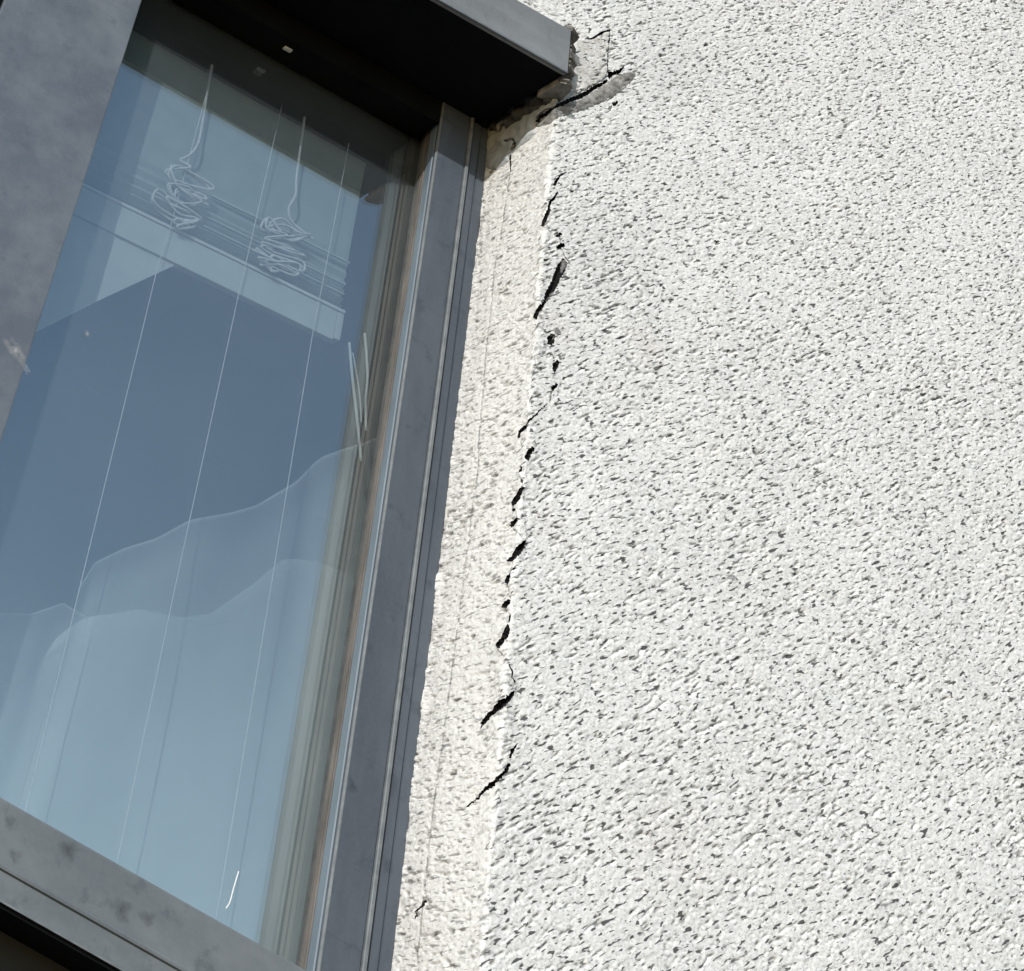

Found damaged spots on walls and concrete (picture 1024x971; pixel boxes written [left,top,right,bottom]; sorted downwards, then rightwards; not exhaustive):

crack [536,29,624,123]
flaking render [571,32,610,94]
crack [541,171,566,249]
crack [465,328,562,808]